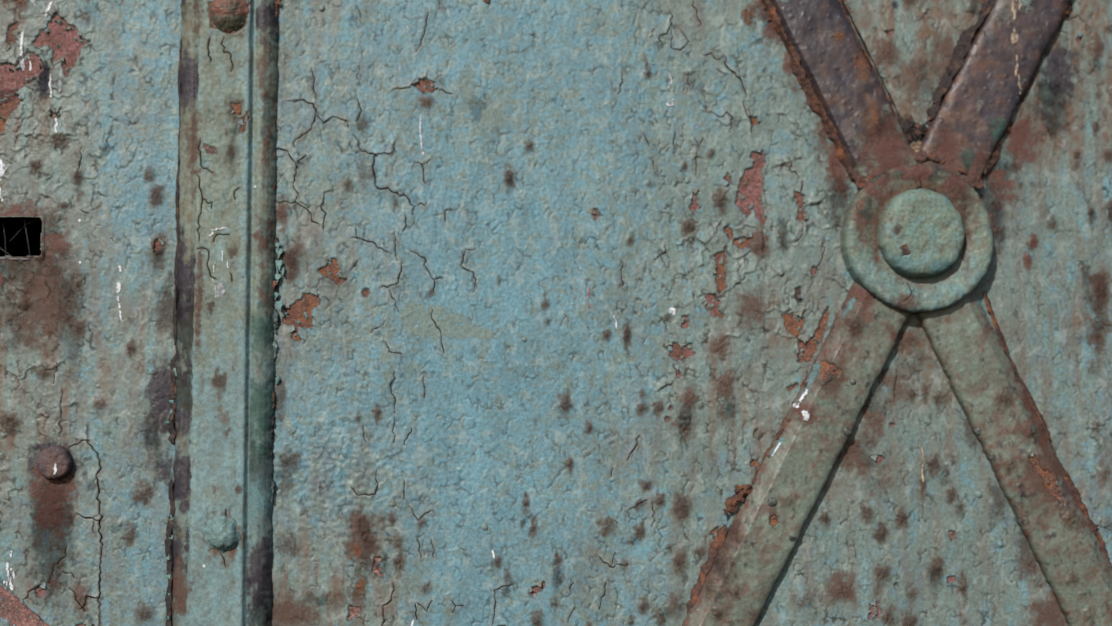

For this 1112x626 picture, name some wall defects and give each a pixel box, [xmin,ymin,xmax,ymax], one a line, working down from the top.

peeling [0,14,89,132]
crack [618,3,752,132]
corrosion [741,0,1112,259]
corrosion [133,0,215,626]
corrosion [253,180,302,280]
peeling [272,237,321,341]
crack [276,67,476,445]
peeling [702,150,767,320]
peeling [782,287,841,393]
corrosion [203,506,401,626]
crack [351,471,435,556]
crack [382,583,461,625]